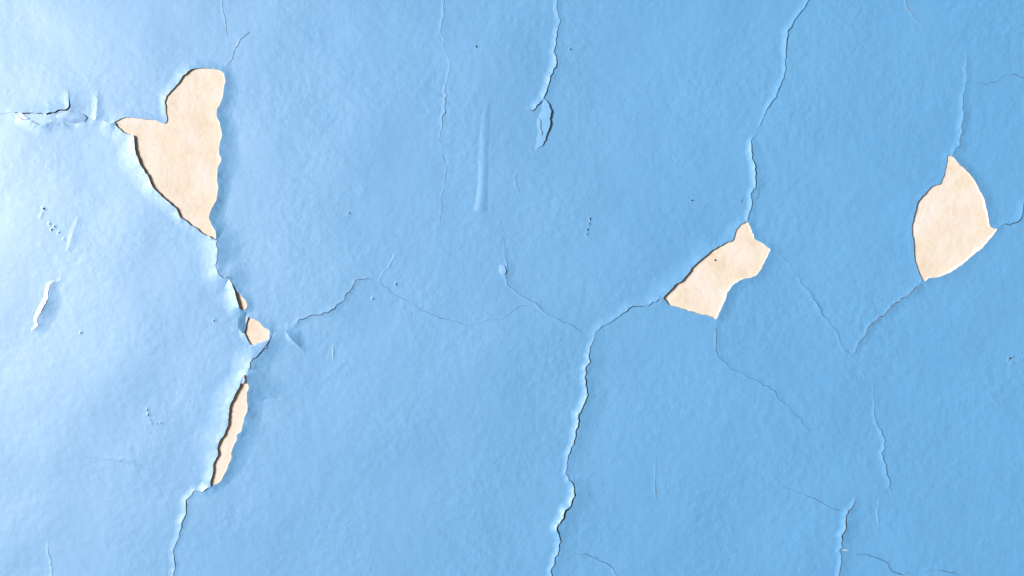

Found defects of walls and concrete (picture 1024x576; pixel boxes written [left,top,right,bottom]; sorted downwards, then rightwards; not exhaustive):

peeling [106,59,241,248]
crack [194,213,252,304]
crack [438,0,450,219]
crack [525,0,567,151]
peeling [643,198,782,328]
crack [743,0,963,576]
peeling [906,148,1005,289]
crack [946,51,975,166]
crack [990,195,1024,229]
peeling [189,275,284,495]
crack [230,239,671,576]
crack [168,475,213,576]